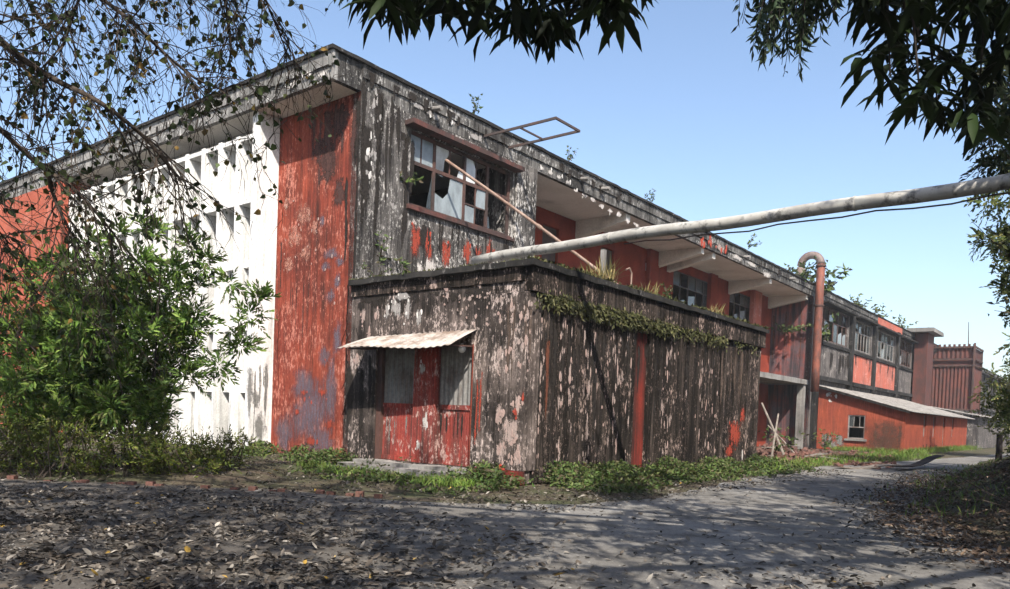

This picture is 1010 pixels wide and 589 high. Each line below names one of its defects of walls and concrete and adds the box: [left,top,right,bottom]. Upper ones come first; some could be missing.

water stain [312,72,430,279]
peeling [283,198,342,305]
peeling [410,222,451,271]
water stain [420,223,460,256]
peeling [463,237,495,264]
peeling [275,325,341,451]
peeling [360,292,422,337]
peeling [443,285,545,433]
spalling [494,392,524,470]
peeling [558,317,632,473]
water stain [506,302,744,445]